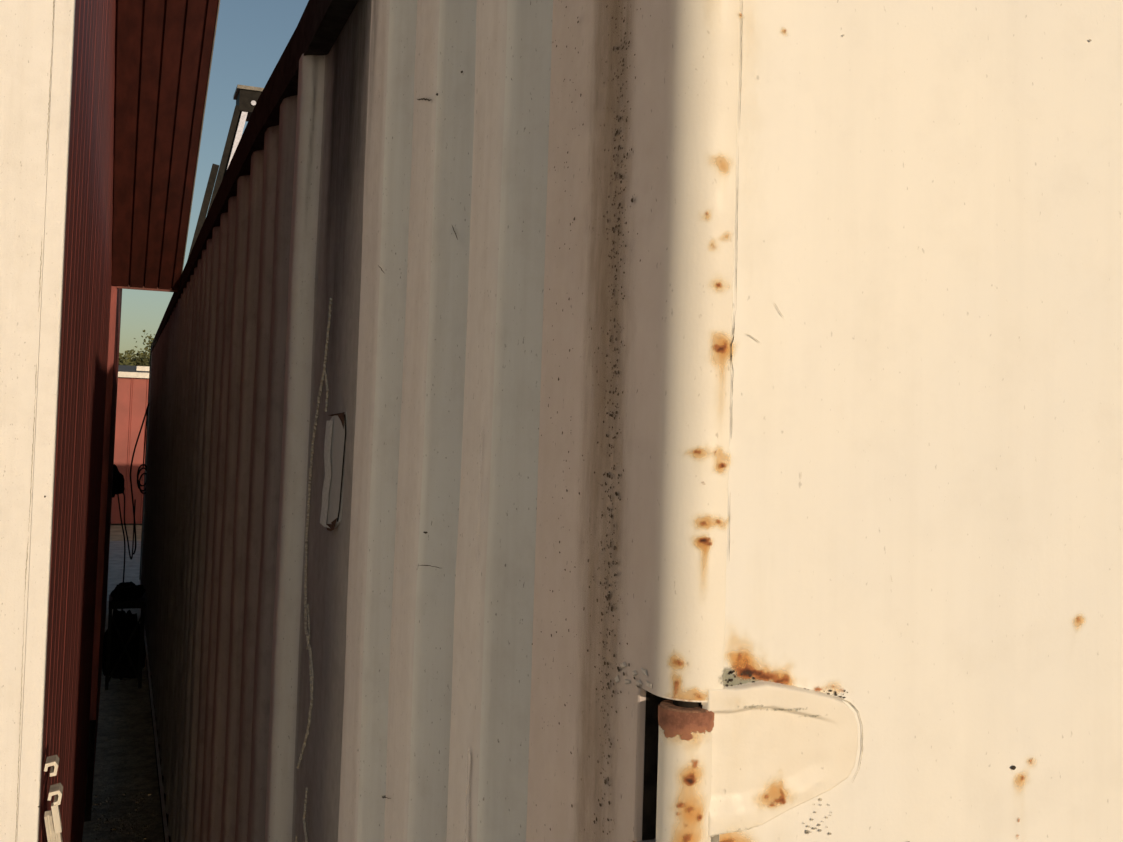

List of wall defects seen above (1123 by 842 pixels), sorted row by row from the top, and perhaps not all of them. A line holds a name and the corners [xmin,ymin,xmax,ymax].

rust [717,158,728,171]
rust [714,335,733,367]
rust [693,449,727,472]
rust [695,517,723,558]
rust [728,651,791,685]
rust [658,656,714,741]
rust [674,761,703,842]
rust [762,782,787,806]
rust [719,833,750,842]